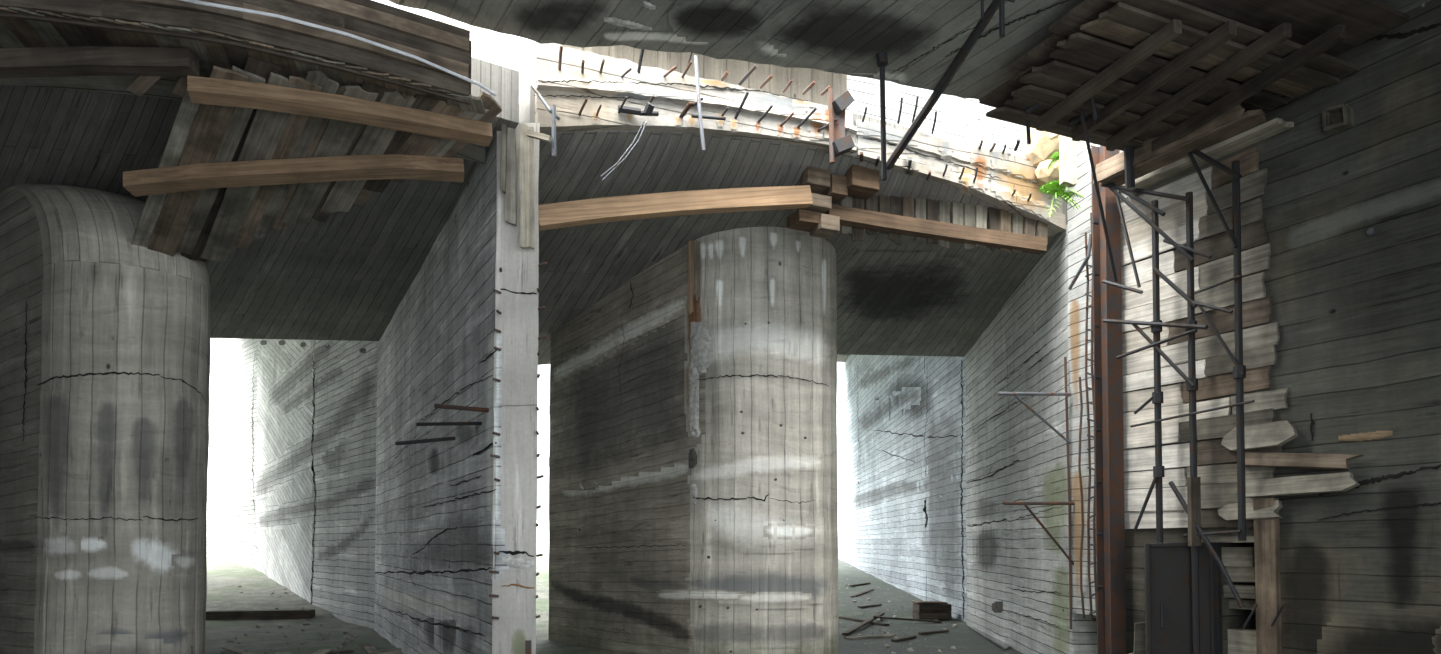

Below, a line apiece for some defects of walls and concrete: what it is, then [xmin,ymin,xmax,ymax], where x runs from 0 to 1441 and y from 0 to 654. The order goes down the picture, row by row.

rust [675,113,697,130]
rust [699,80,753,92]
rust [716,100,829,141]
crack [22,301,206,440]
damp [0,390,197,582]
crack [375,349,534,636]
crack [693,327,1061,619]
crack [1316,464,1441,520]